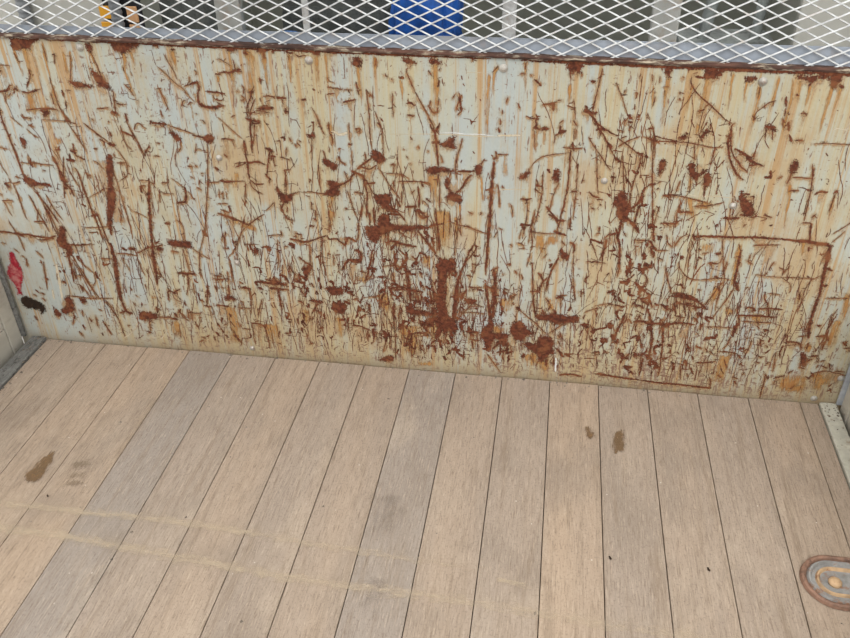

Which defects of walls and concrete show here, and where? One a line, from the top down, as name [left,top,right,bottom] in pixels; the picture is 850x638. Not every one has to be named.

corrosion [3,38,850,393]
leakage [612,429,625,454]
leakage [26,451,55,482]